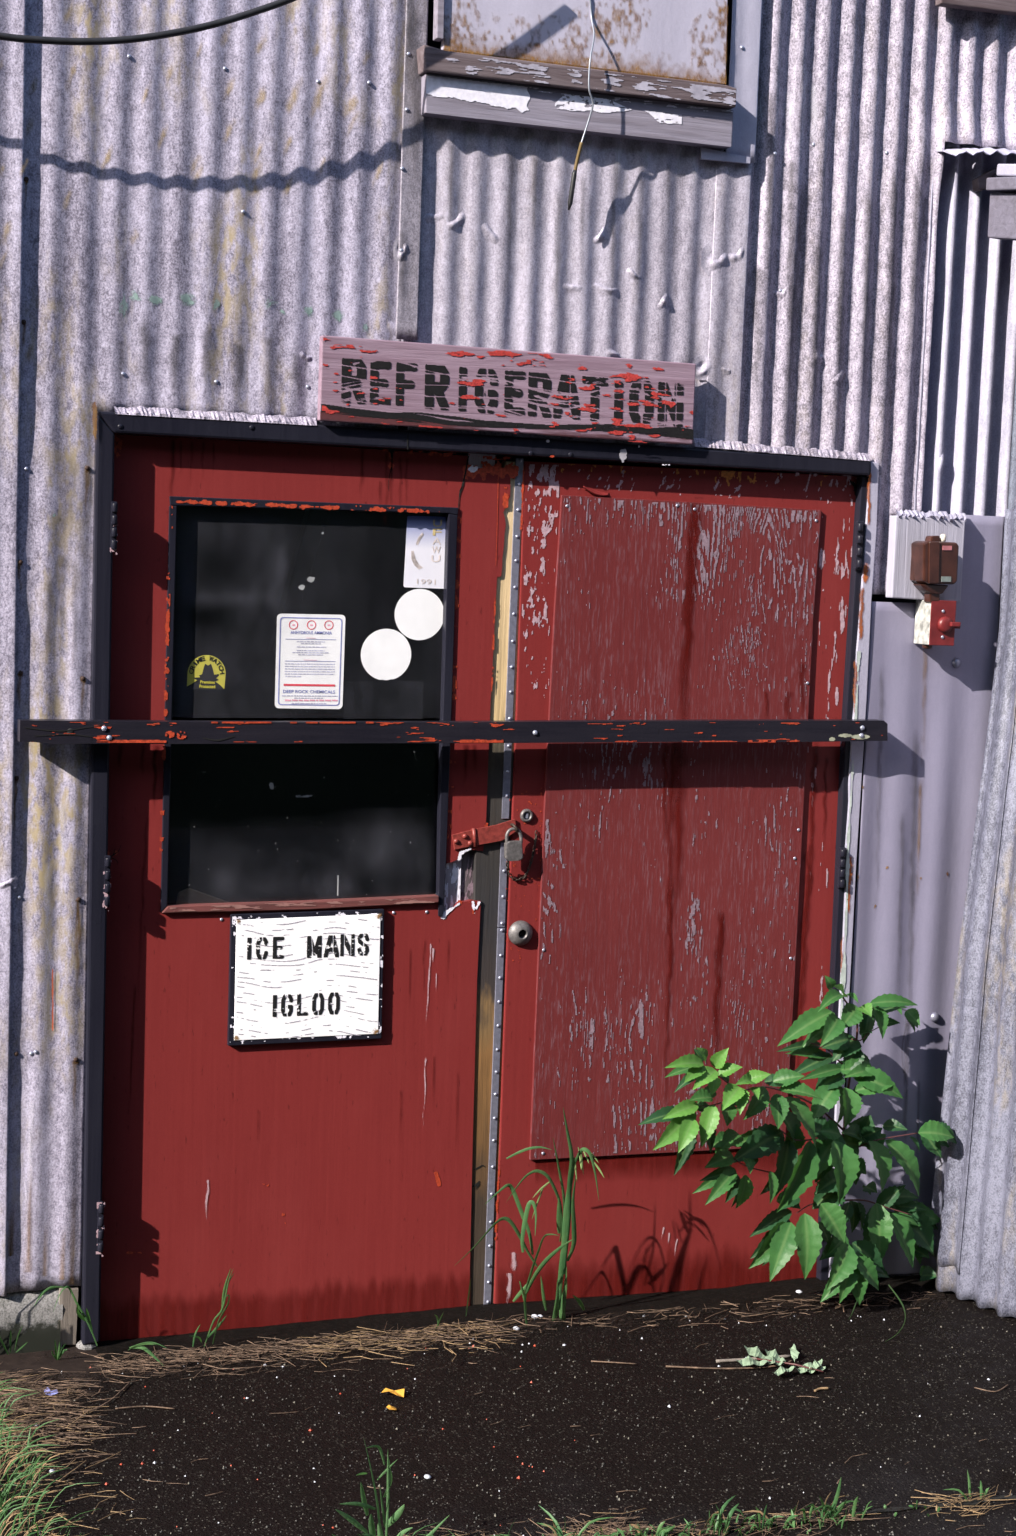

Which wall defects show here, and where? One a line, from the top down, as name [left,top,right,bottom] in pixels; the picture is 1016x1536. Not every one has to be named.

rust [443,0,728,84]
peeling [424,57,736,124]
peeling [322,338,403,417]
peeling [445,350,554,367]
peeling [290,722,514,743]
peeling [383,364,883,1154]
peeling [170,810,481,1039]